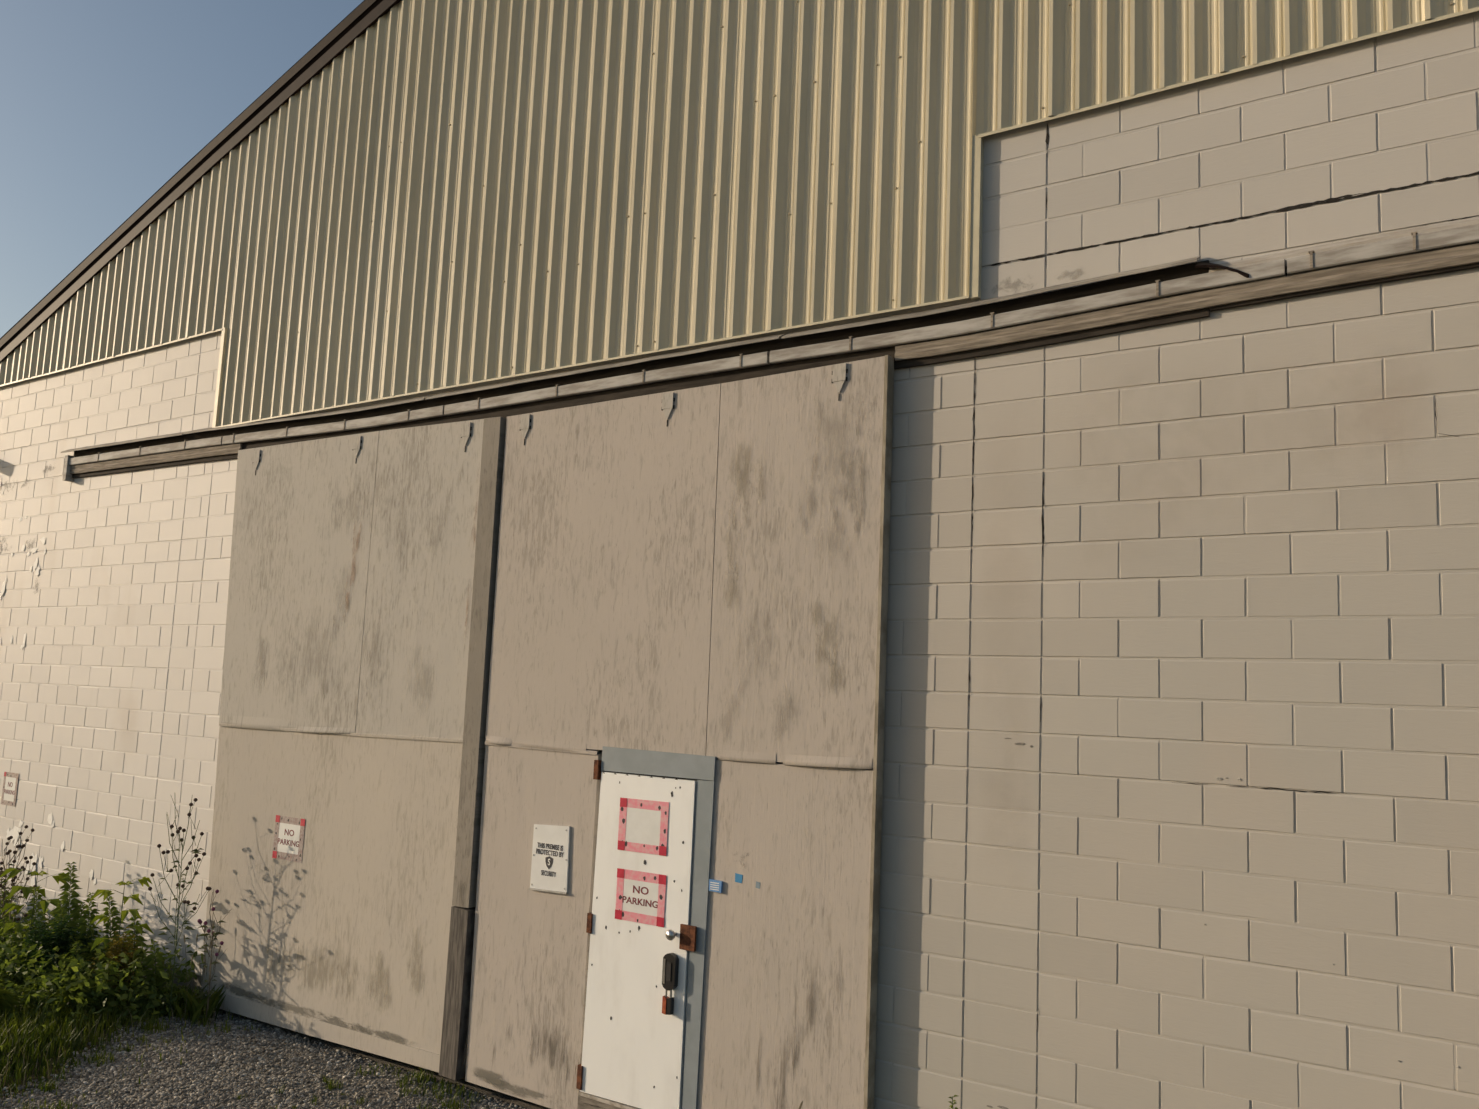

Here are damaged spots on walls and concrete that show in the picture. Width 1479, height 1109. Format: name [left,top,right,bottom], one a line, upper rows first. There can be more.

crack [1043,124,1051,152]
crack [983,171,1479,267]
crack [1038,479,1046,552]